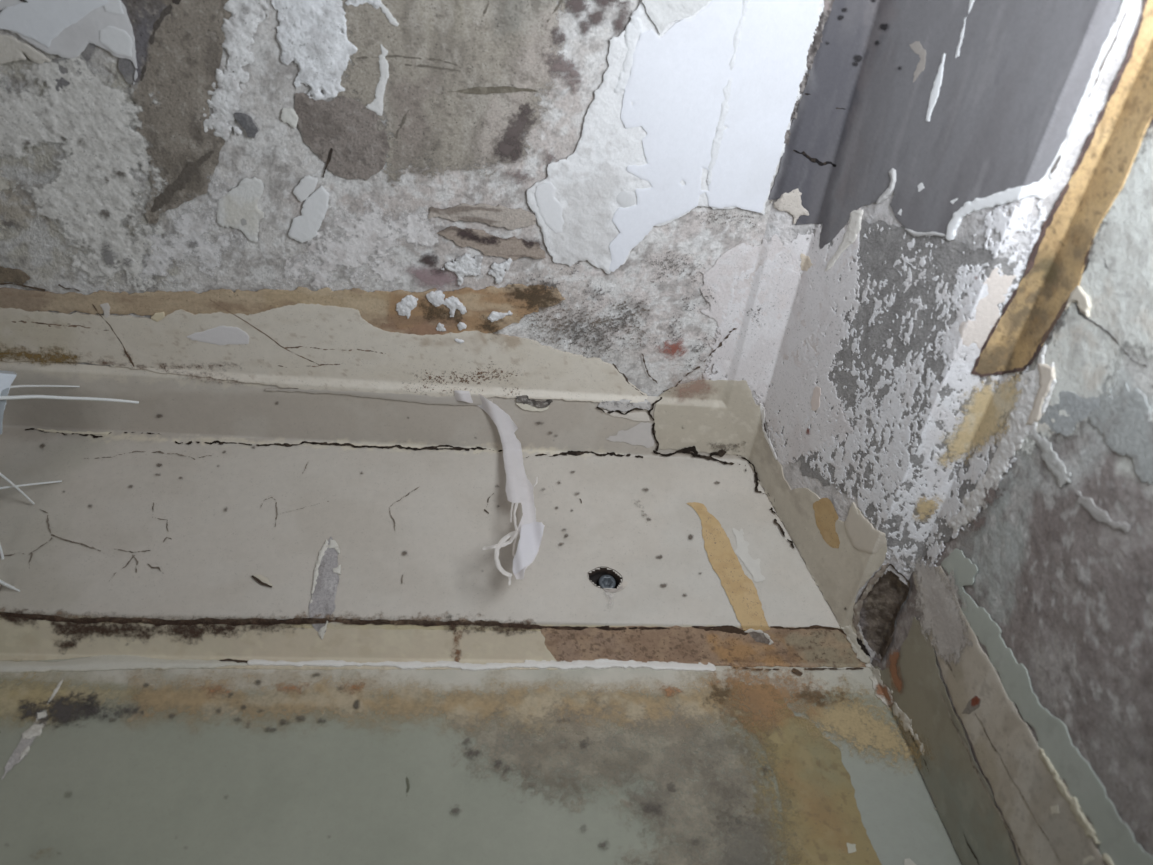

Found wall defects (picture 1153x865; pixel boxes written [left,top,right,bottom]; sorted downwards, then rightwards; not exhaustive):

damp [421,303,462,323]
flaking render [0,0,1133,672]
damp [508,248,716,397]
crack [25,328,794,548]
crack [4,503,171,581]
damp [0,673,928,865]